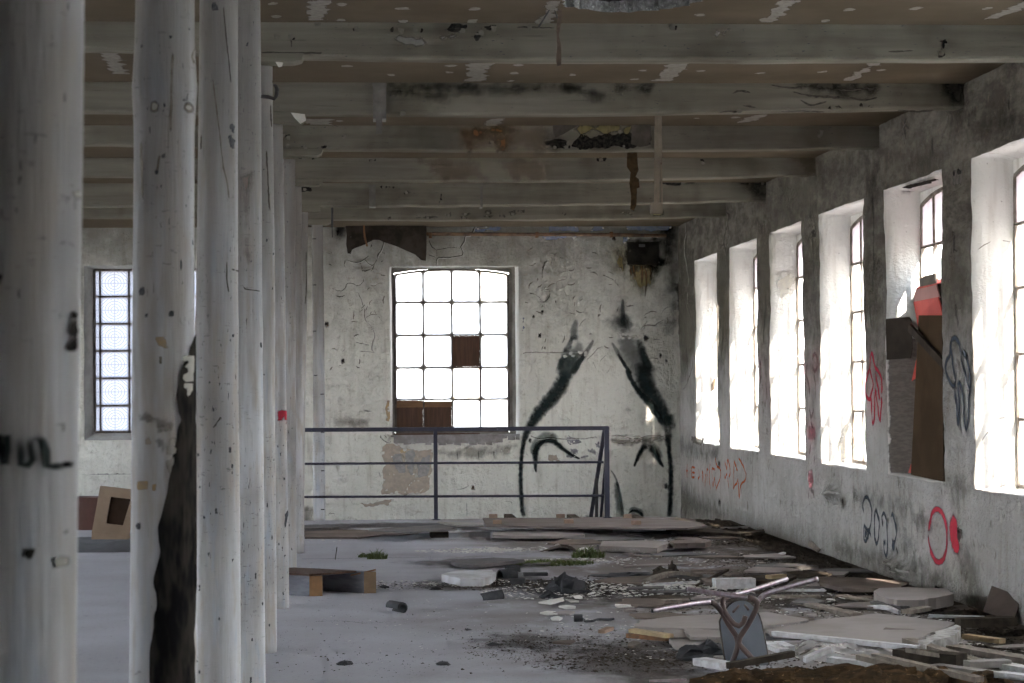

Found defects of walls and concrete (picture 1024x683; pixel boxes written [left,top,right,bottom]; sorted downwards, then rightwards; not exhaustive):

damp [396,83,538,99]
damp [561,83,605,101]
damp [797,83,878,97]
crack [429,227,476,264]
crack [334,242,385,353]
peeling [361,443,433,507]